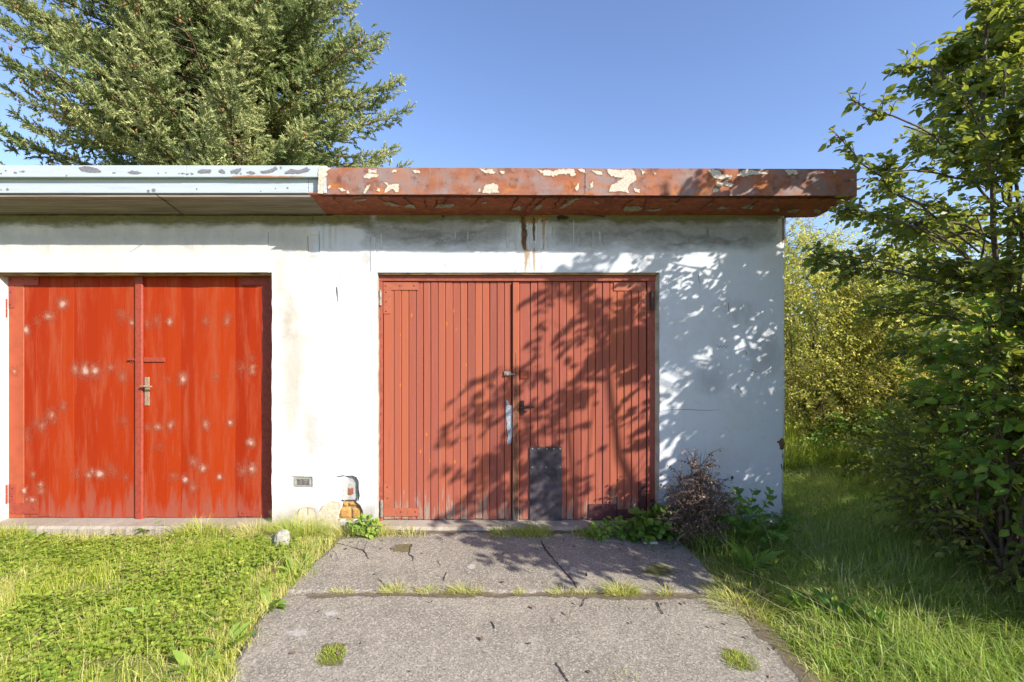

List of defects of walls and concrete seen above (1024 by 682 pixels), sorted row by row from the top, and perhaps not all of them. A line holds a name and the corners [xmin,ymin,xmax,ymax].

peeling [158,166,415,208]
peeling [478,168,505,204]
peeling [538,169,656,220]
peeling [703,169,768,210]
leakage [0,214,782,251]
rust [316,192,843,268]
spalling [294,475,363,526]
crack [542,543,587,607]